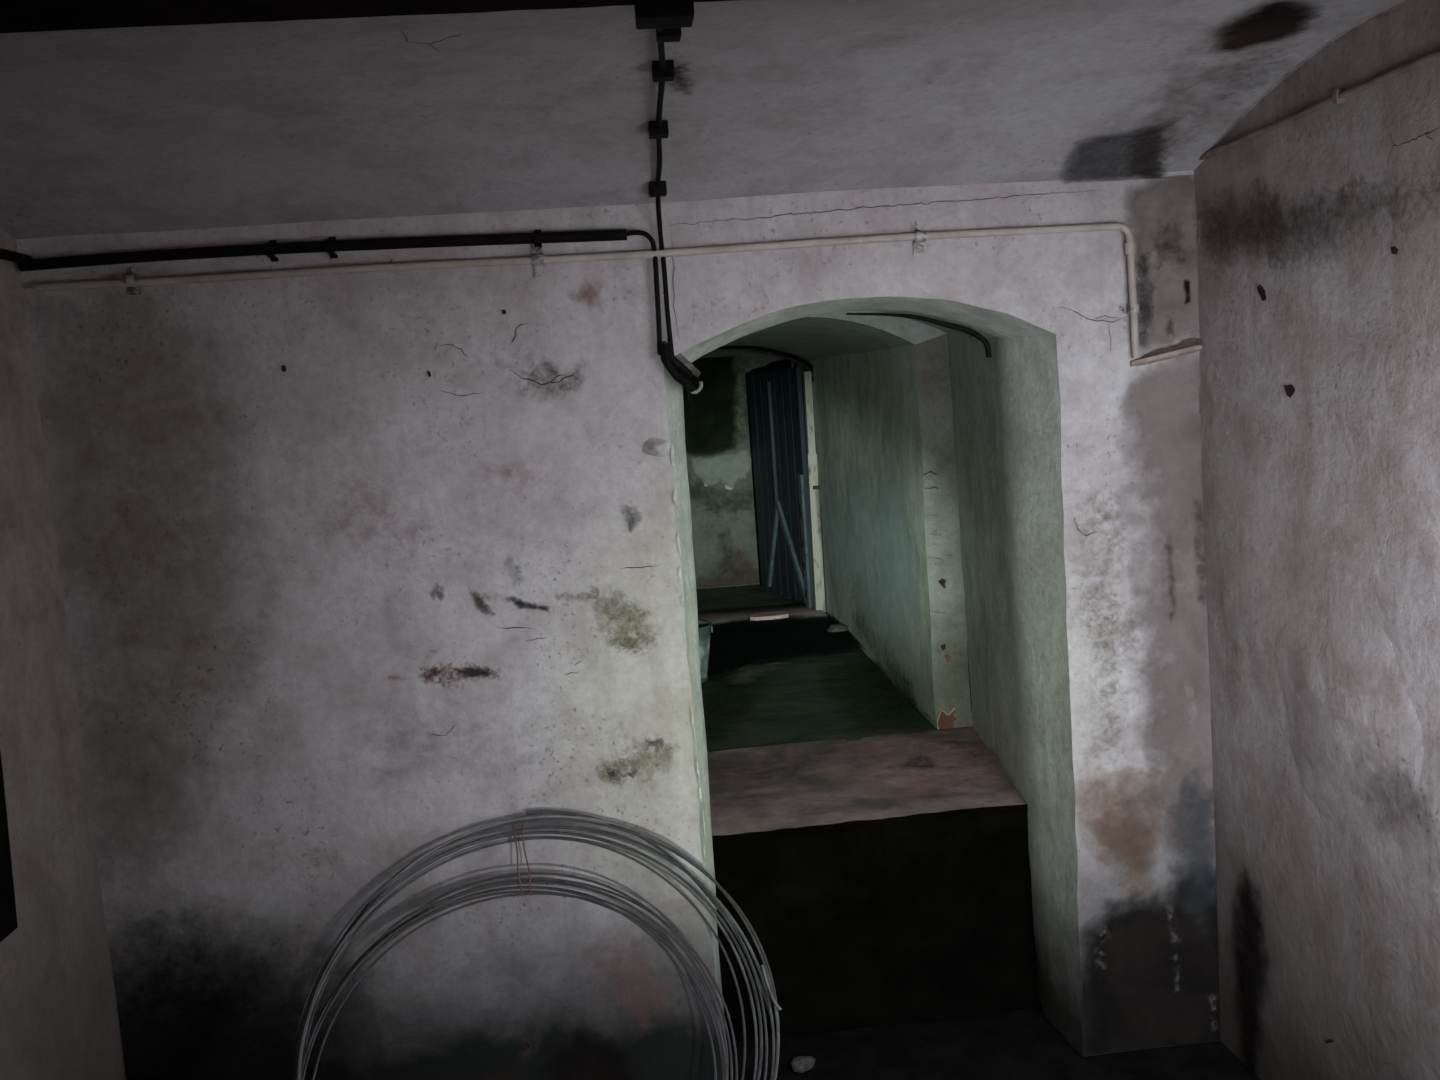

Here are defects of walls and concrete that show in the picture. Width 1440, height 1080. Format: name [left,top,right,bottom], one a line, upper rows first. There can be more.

crack [511,323,577,385]
water stain [597,599,649,648]
water stain [1085,361,1267,1076]
water stain [602,741,672,779]